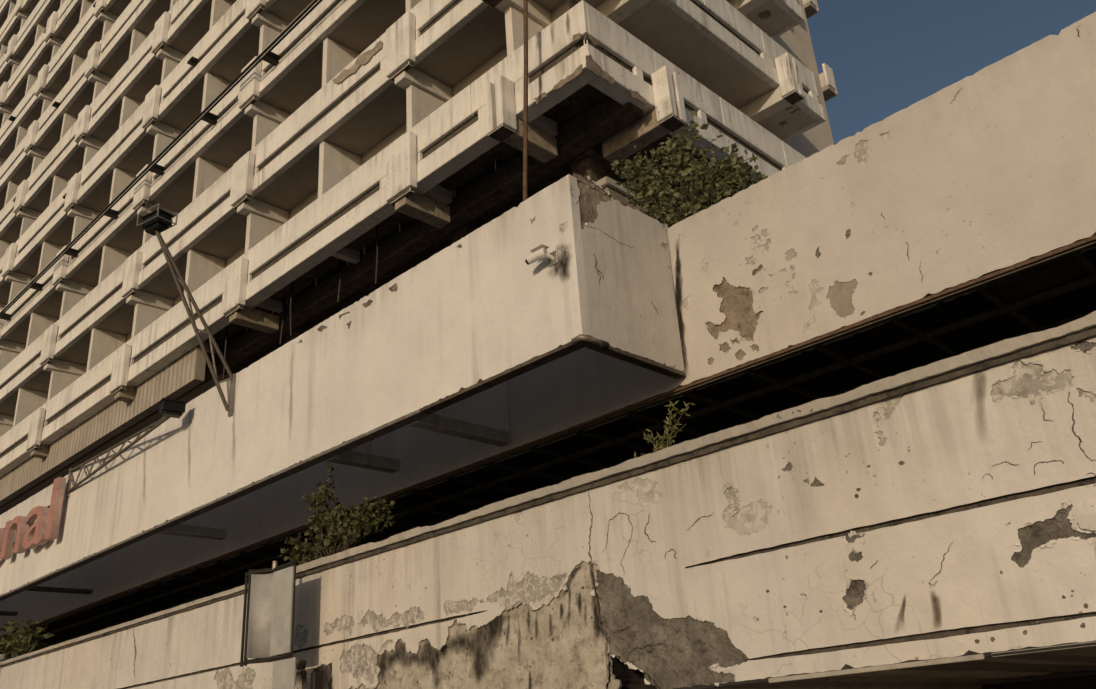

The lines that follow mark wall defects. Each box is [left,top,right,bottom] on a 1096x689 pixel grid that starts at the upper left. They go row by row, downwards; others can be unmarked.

flaking render [569,173,612,230]
crack [592,227,633,285]
flaking render [704,225,867,365]
peeling [990,360,1096,406]
crack [983,392,1096,479]
flaking render [1011,499,1096,568]
flaking render [295,559,750,689]
crack [588,493,714,689]
flaking render [843,579,869,616]